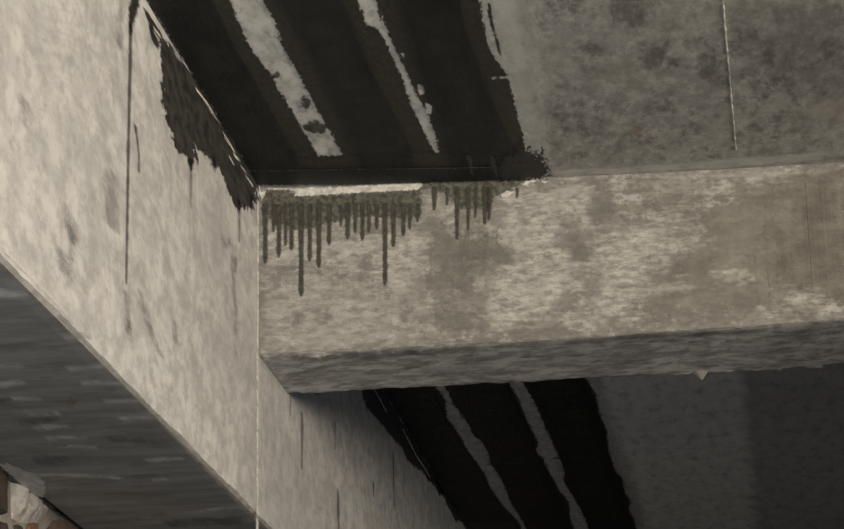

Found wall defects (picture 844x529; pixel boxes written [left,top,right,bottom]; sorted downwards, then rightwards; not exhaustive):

water stain [143,3,594,350]
water stain [553,152,844,323]